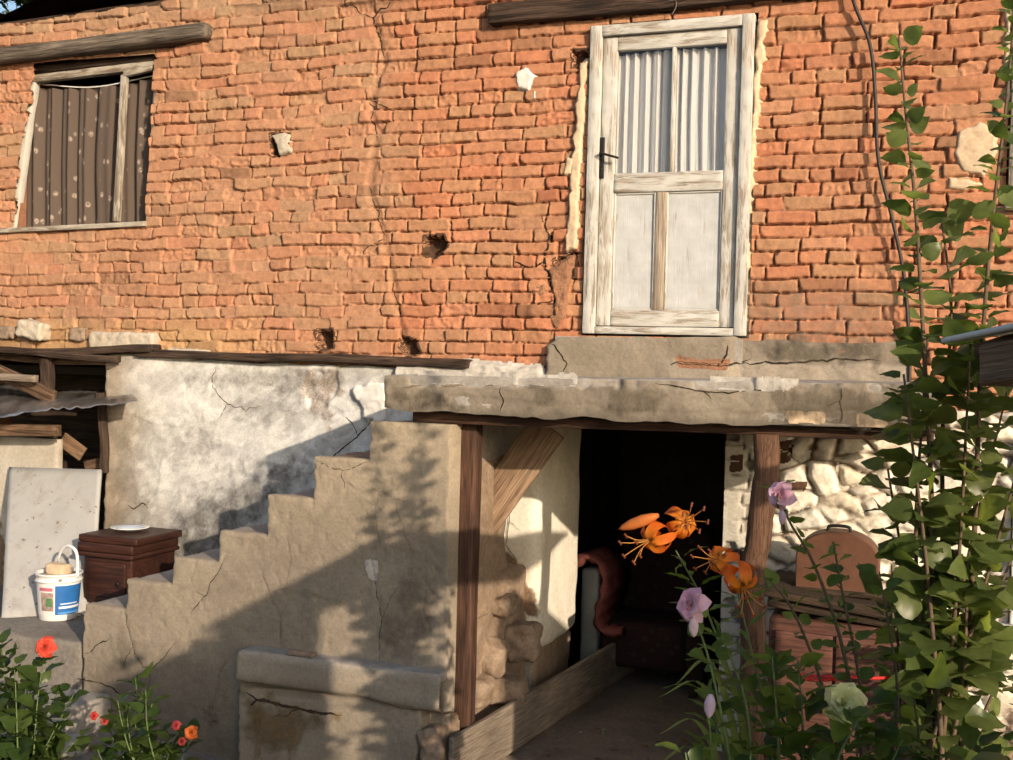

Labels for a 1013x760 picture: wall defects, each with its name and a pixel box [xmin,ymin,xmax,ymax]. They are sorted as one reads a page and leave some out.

crack [352,0,394,57]
crack [363,187,385,255]
spalling [421,233,450,259]
crack [515,217,568,372]
crack [211,367,259,419]
spalling [313,327,338,351]
spalling [397,335,422,357]
crack [656,345,880,398]
damp [175,500,235,556]
crack [311,417,439,631]
crack [78,604,174,703]
crack [212,653,342,717]